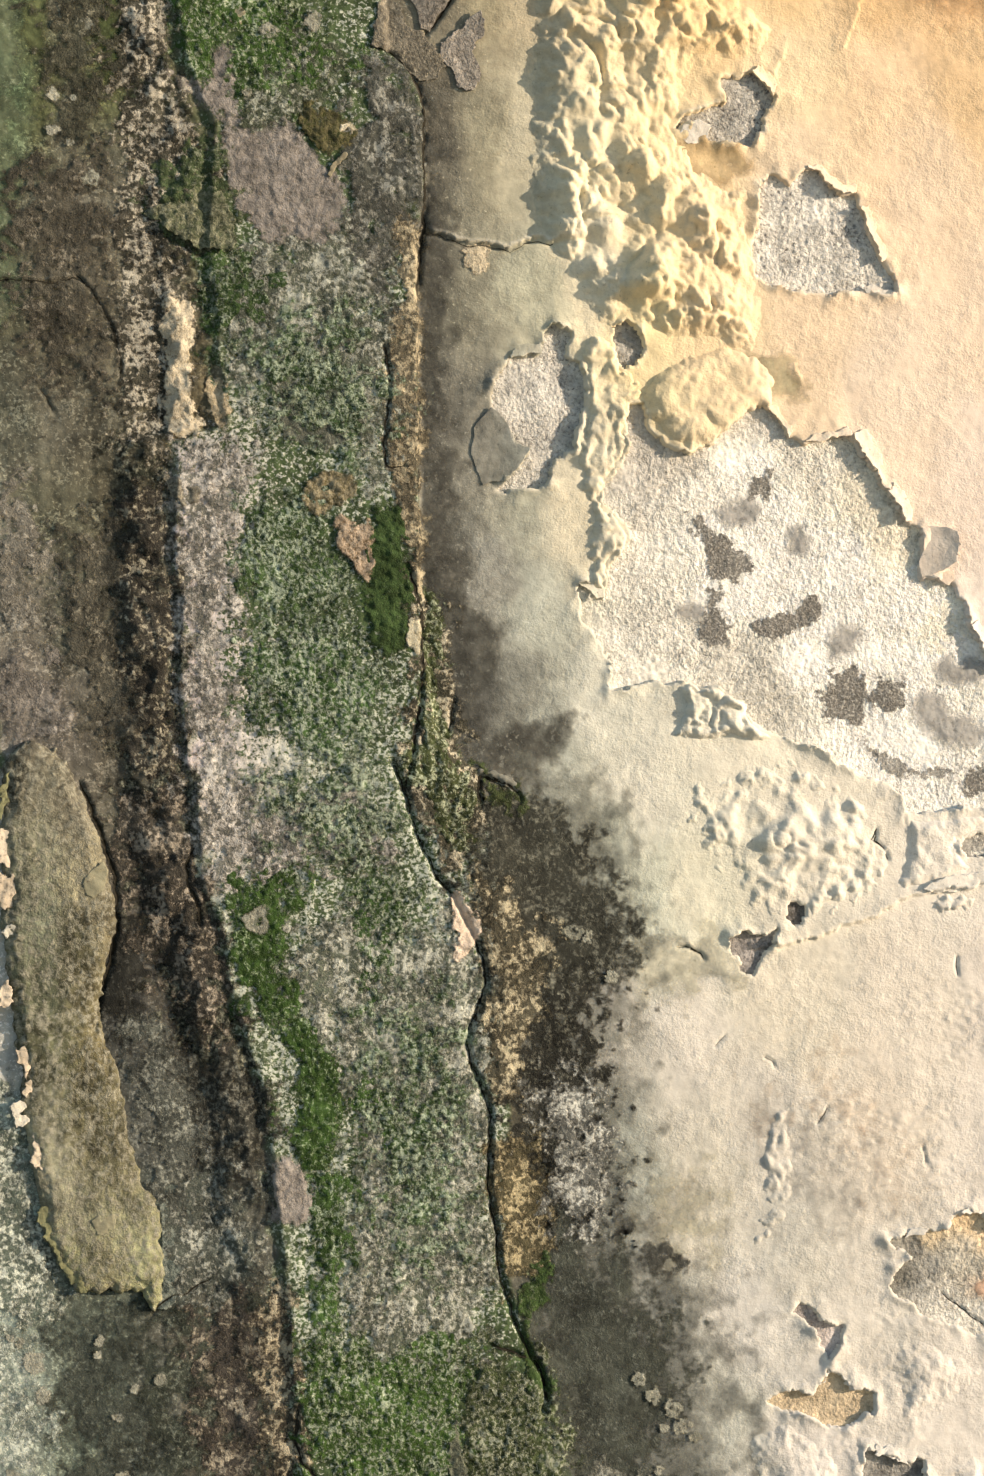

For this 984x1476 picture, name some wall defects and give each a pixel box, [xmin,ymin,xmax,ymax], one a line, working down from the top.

crack [380,48,553,291]
peeling [752,164,896,296]
crack [382,345,404,468]
peeling [471,325,586,493]
peeling [577,404,984,814]
crack [393,568,455,894]
crack [477,776,521,803]
water stain [392,131,757,1476]
peeling [729,902,805,975]
crack [467,940,548,1406]
peeling [890,1205,984,1335]
peeling [862,1443,923,1476]